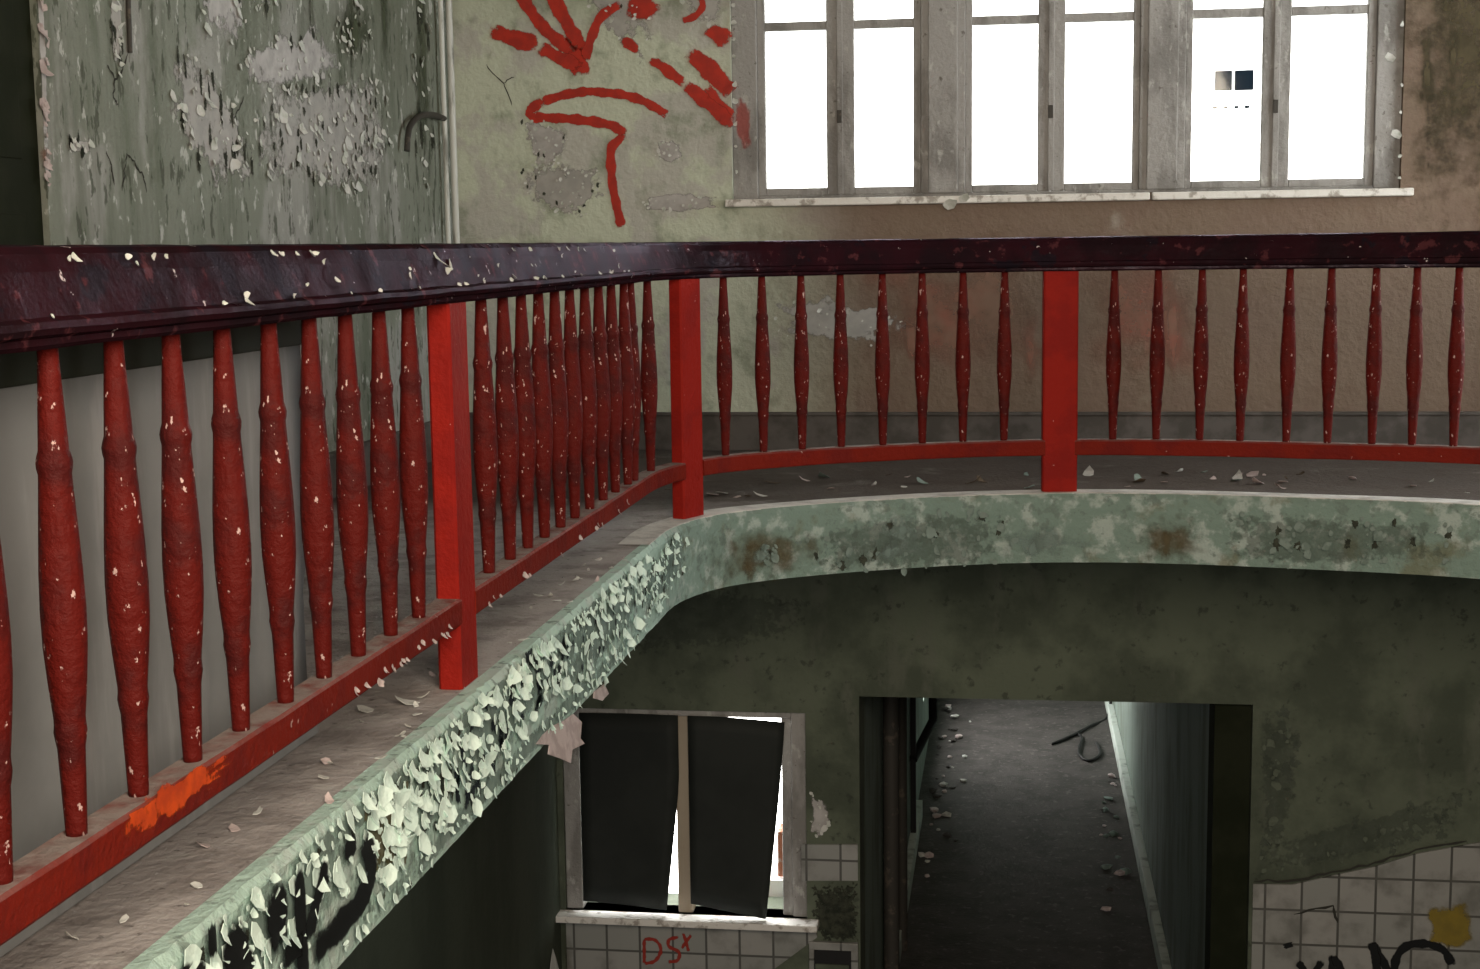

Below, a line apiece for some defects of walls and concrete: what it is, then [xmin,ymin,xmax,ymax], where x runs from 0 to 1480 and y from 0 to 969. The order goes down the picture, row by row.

peeling [170,0,392,195]
peeling [125,755,229,836]
peeling [170,533,690,969]